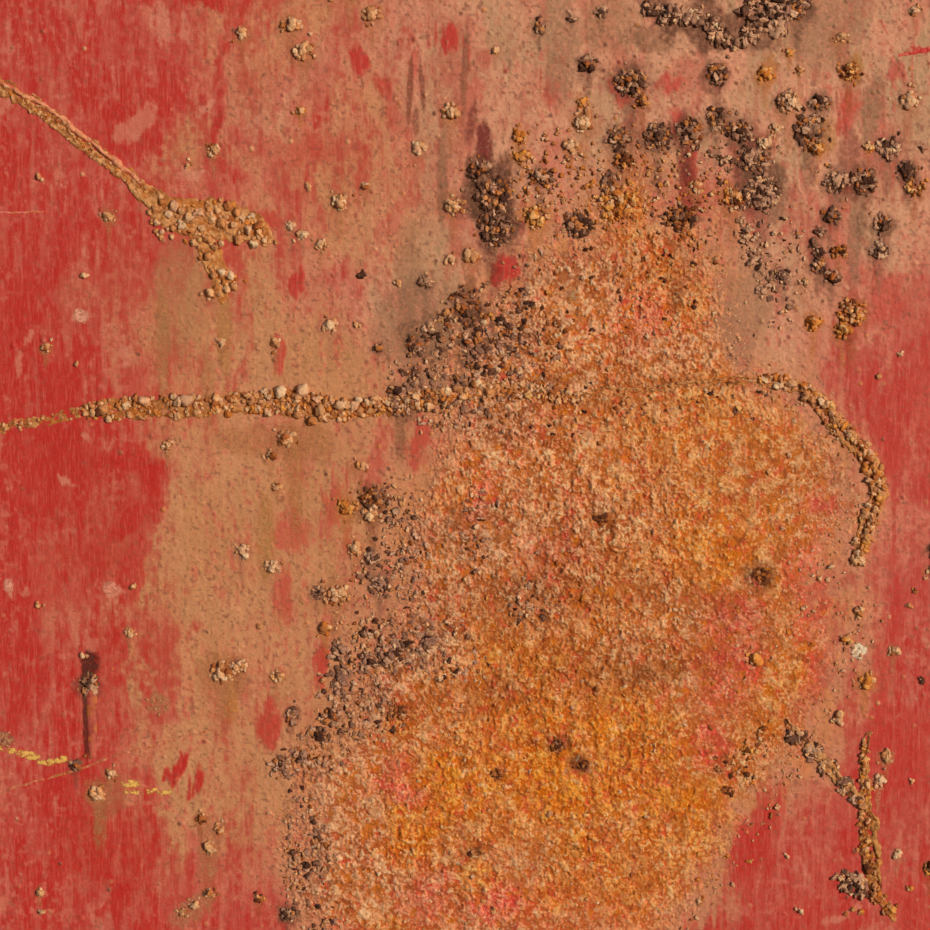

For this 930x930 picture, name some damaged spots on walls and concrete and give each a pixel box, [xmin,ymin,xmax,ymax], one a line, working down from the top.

corrosion [280,15,316,67]
corrosion [361,5,384,27]
corrosion [534,16,546,35]
corrosion [572,54,599,81]
corrosion [594,5,608,19]
corrosion [612,61,650,110]
corrosion [642,0,813,89]
corrosion [836,54,865,88]
corrosion [862,131,929,198]
corrosion [868,212,894,260]
corrosion [253,88,884,930]
corrosion [869,748,894,791]